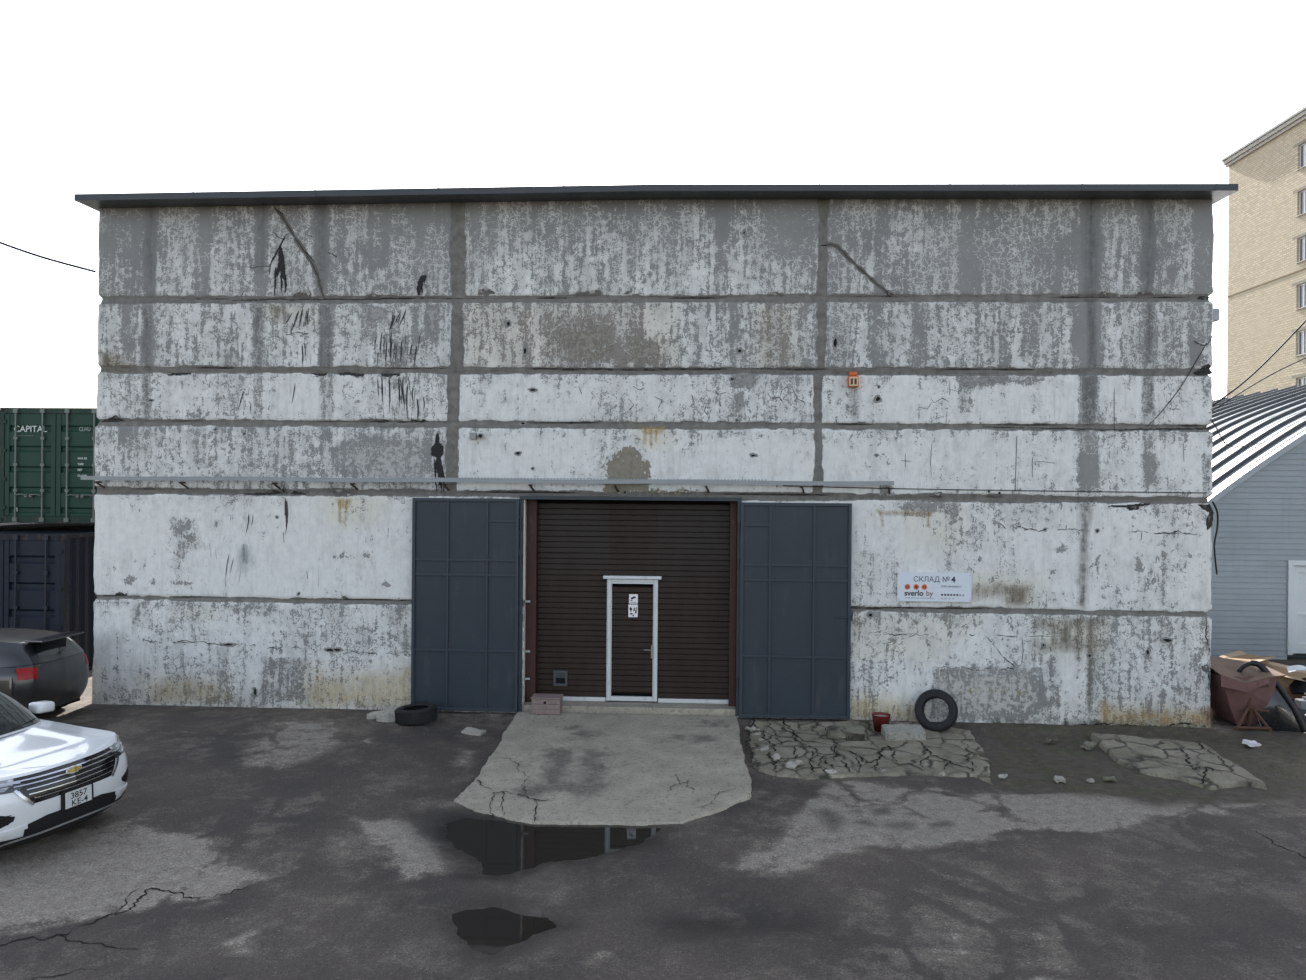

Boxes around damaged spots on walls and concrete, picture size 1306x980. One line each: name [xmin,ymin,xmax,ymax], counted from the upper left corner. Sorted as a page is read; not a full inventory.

crack [241,206,337,297]
crack [820,242,897,298]
spalling [242,290,412,301]
spalling [1076,291,1154,299]
spalling [1193,364,1213,375]
peeling [729,373,760,422]
peeling [331,439,428,497]
peeling [599,446,706,497]
peeling [898,498,961,525]
peeling [170,519,196,554]
peeling [100,575,155,596]
peeling [929,656,1043,721]